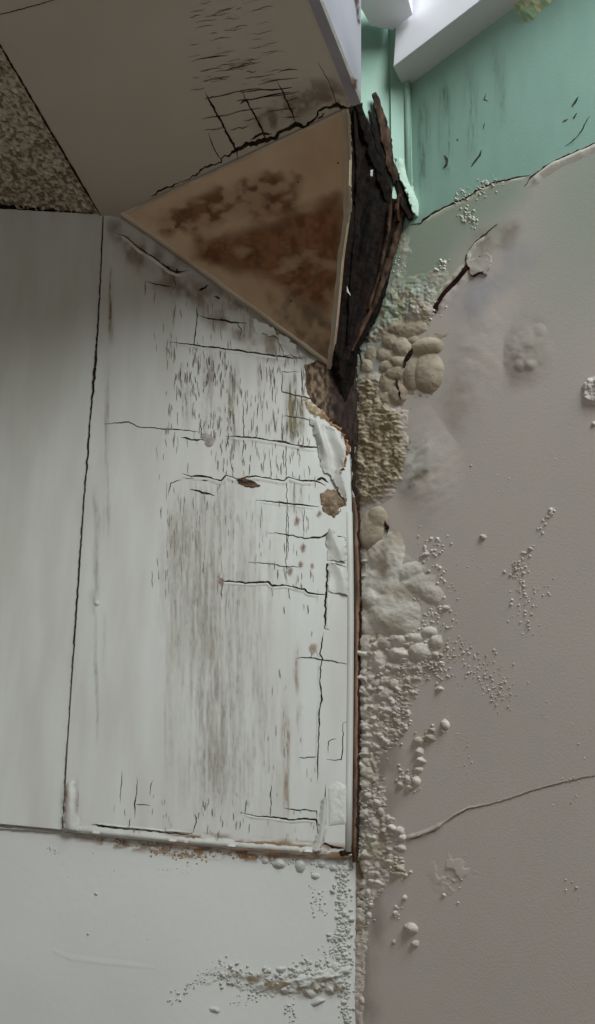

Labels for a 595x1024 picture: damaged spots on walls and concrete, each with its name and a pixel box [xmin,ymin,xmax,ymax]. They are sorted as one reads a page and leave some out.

crack [152,1,353,196]
flaking render [356,212,452,375]
crack [411,143,595,314]
crack [0,44,345,849]
damp [286,378,303,437]
peeling [309,418,348,596]
crack [405,774,595,841]